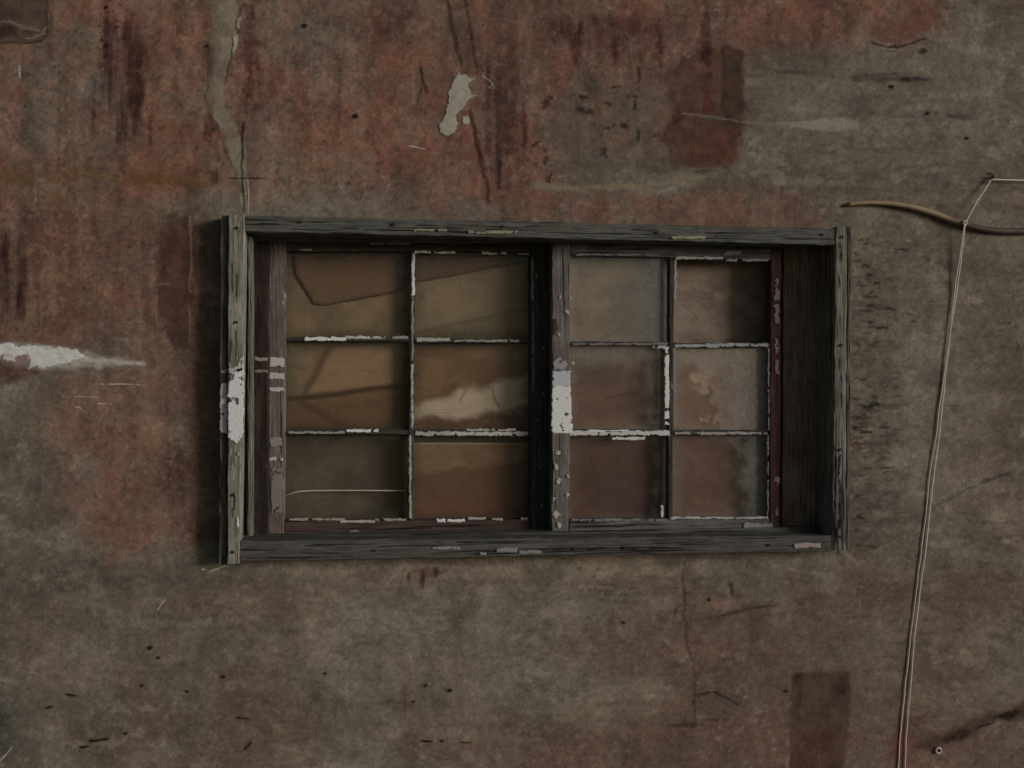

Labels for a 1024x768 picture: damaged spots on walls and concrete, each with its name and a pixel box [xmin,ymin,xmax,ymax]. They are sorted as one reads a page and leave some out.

crack [207,0,262,214]